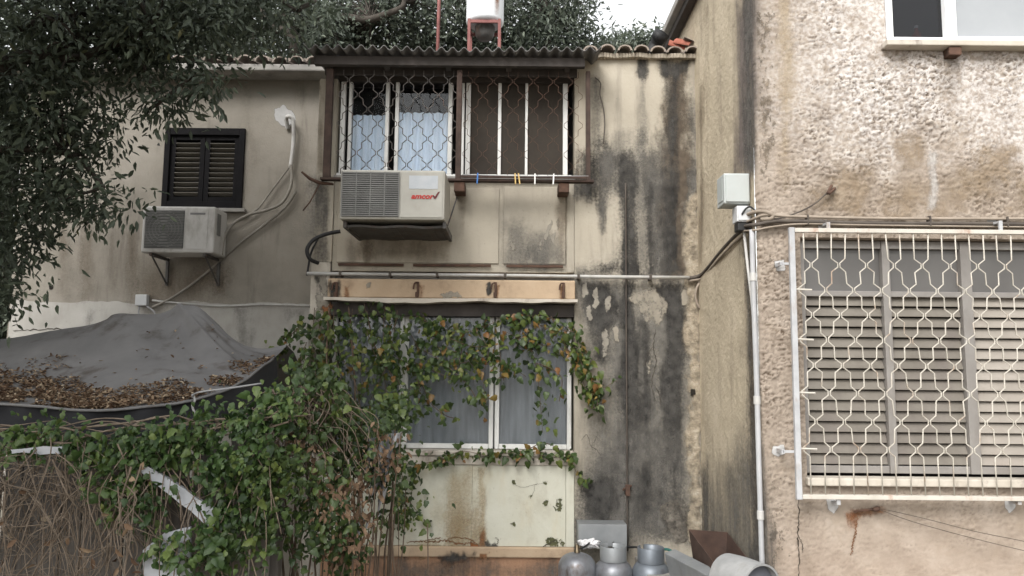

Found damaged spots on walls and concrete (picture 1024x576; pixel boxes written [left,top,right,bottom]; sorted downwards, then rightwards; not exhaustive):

damp [734,0,756,174]
peeling [582,283,611,321]
peeling [602,326,619,357]
damp [574,59,702,543]
peeling [629,288,668,325]
crack [796,500,804,576]